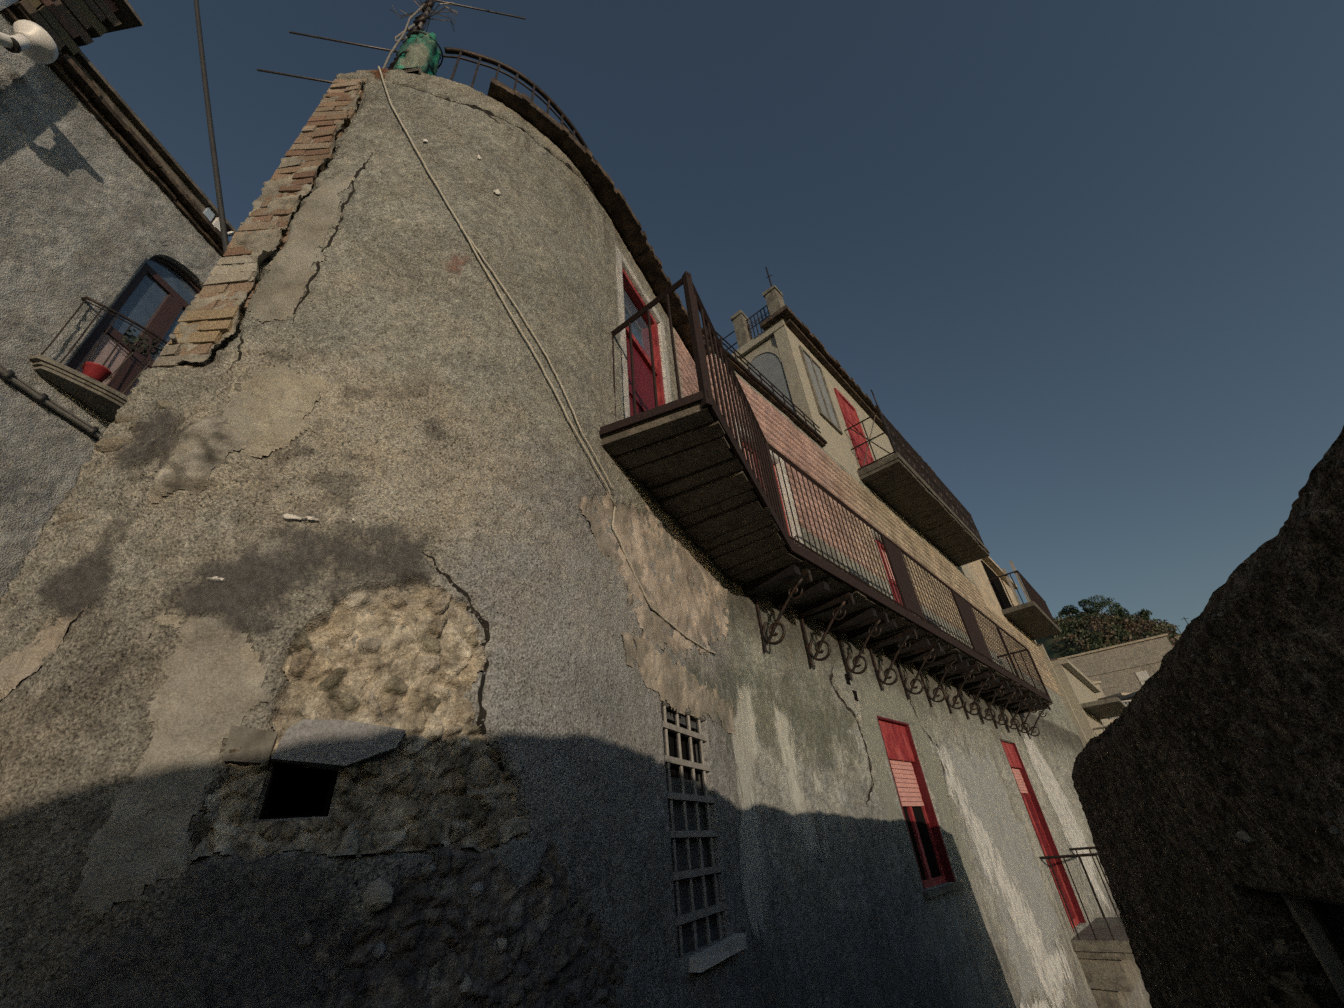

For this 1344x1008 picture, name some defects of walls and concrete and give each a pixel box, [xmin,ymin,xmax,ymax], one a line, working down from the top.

spalling [152,78,367,368]
crack [292,153,373,324]
damp [39,523,123,617]
damp [166,513,430,632]
spalling [186,579,530,863]
damp [31,855,356,1008]